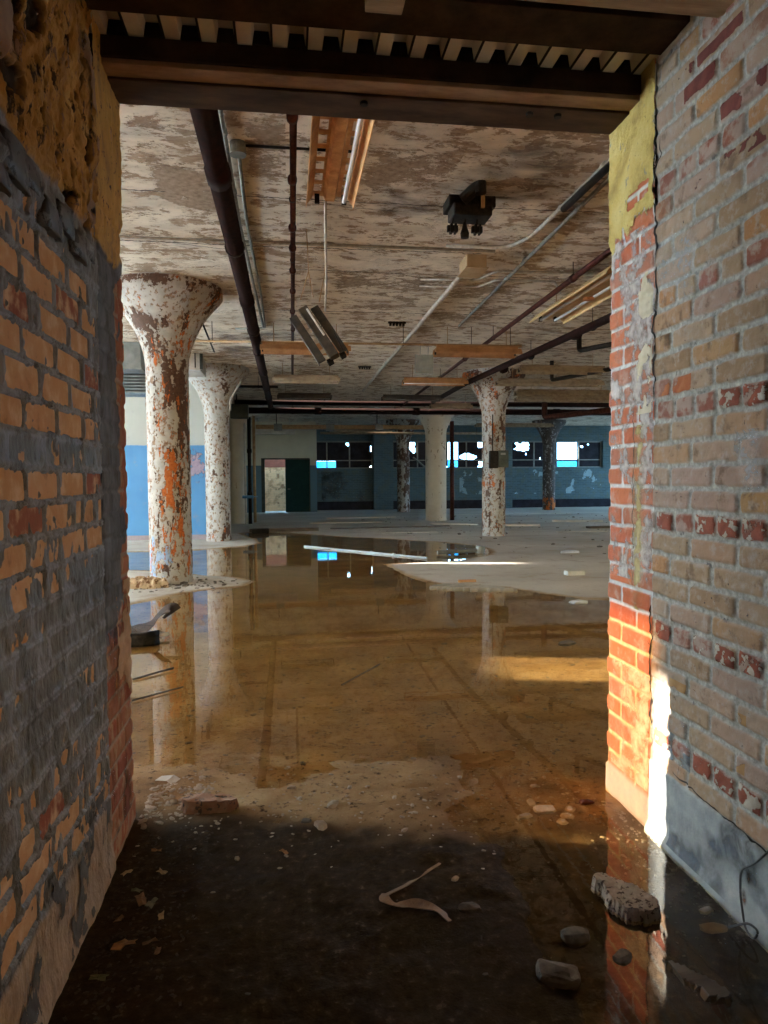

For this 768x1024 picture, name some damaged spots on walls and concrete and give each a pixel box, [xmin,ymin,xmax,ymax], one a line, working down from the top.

flaking render [0,0,27,61]
peeling [121,117,219,225]
peeling [365,133,469,194]
peeling [310,250,439,310]
peeling [608,58,691,502]
crack [632,111,662,586]
peeling [117,251,243,577]
peeling [460,369,525,536]
peeling [533,421,601,510]
spalling [718,382,768,409]
peeling [611,512,672,580]
spalling [694,514,767,541]